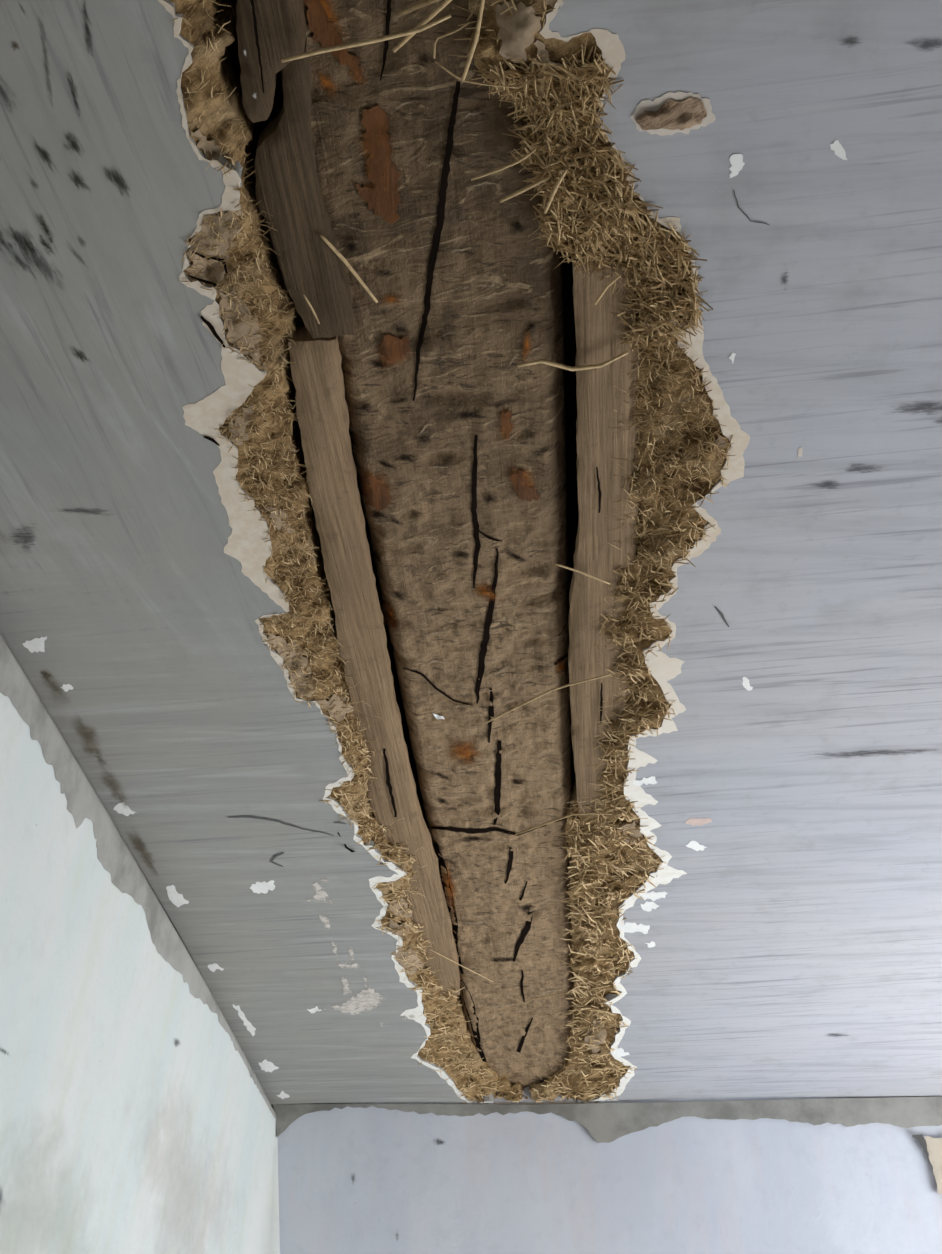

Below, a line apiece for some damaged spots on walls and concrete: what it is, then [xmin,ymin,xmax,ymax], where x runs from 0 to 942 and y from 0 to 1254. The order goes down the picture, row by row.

spalling [631,91,716,136]
water stain [107,171,127,194]
peeling [539,0,699,300]
water stain [0,217,53,260]
crack [412,81,461,401]
peeling [158,0,324,716]
crack [554,653,568,665]
crack [383,748,397,817]
peeling [0,315,942,1143]
crack [403,435,563,1068]
peeling [924,1136,942,1195]